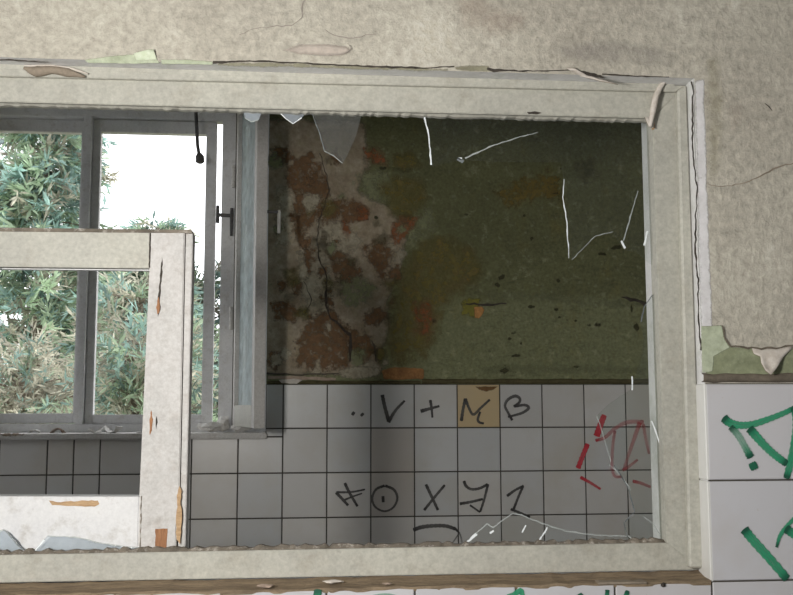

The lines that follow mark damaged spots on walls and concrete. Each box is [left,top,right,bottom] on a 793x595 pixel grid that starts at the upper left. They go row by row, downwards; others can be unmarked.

crack [267,114,352,376]
spalling [267,119,437,384]
peeling [701,325,793,375]